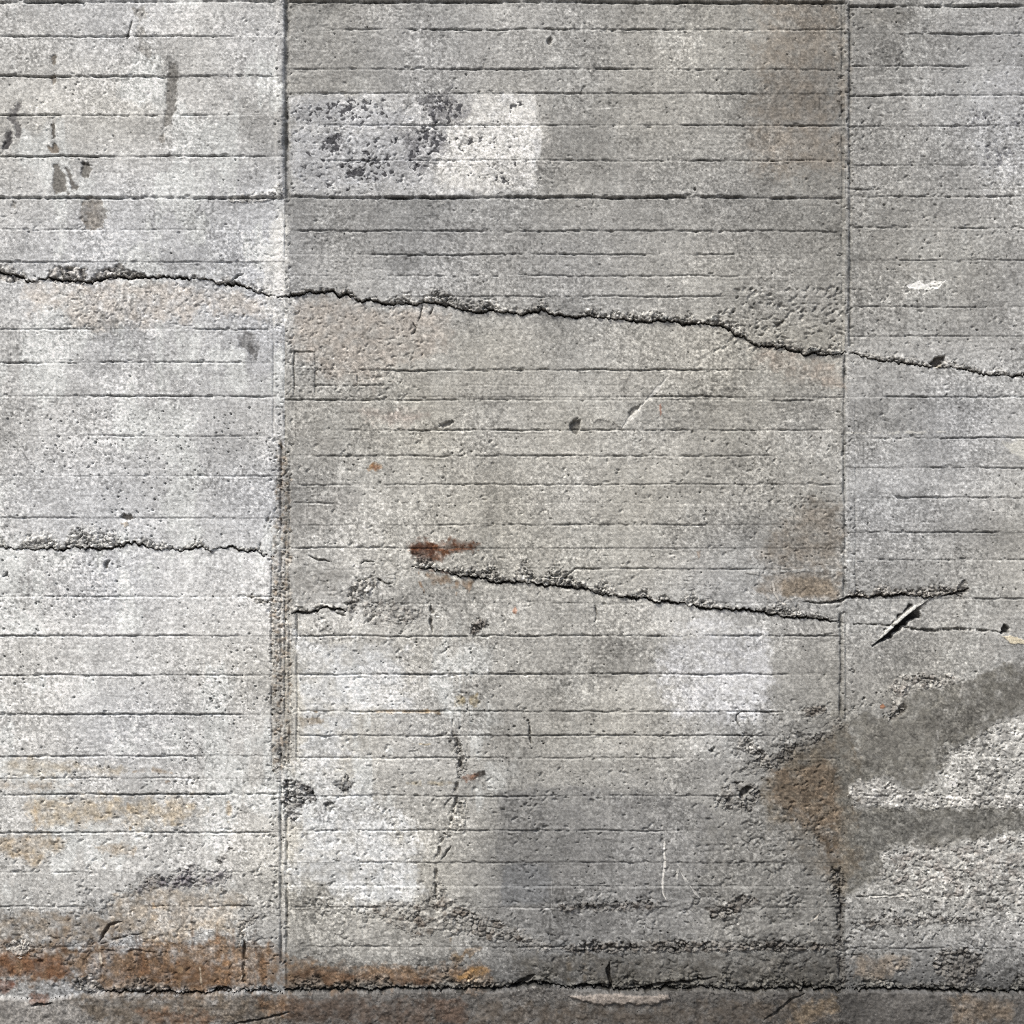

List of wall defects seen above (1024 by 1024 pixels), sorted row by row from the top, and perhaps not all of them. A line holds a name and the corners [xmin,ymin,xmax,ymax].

crack [0,261,1024,378]
crack [293,350,317,396]
crack [0,520,273,558]
corrosion [406,535,482,596]
crack [292,548,999,633]
water stain [494,657,1024,1000]
corrosion [0,875,843,1024]
crack [285,980,1024,995]
corrosion [944,992,1021,1024]